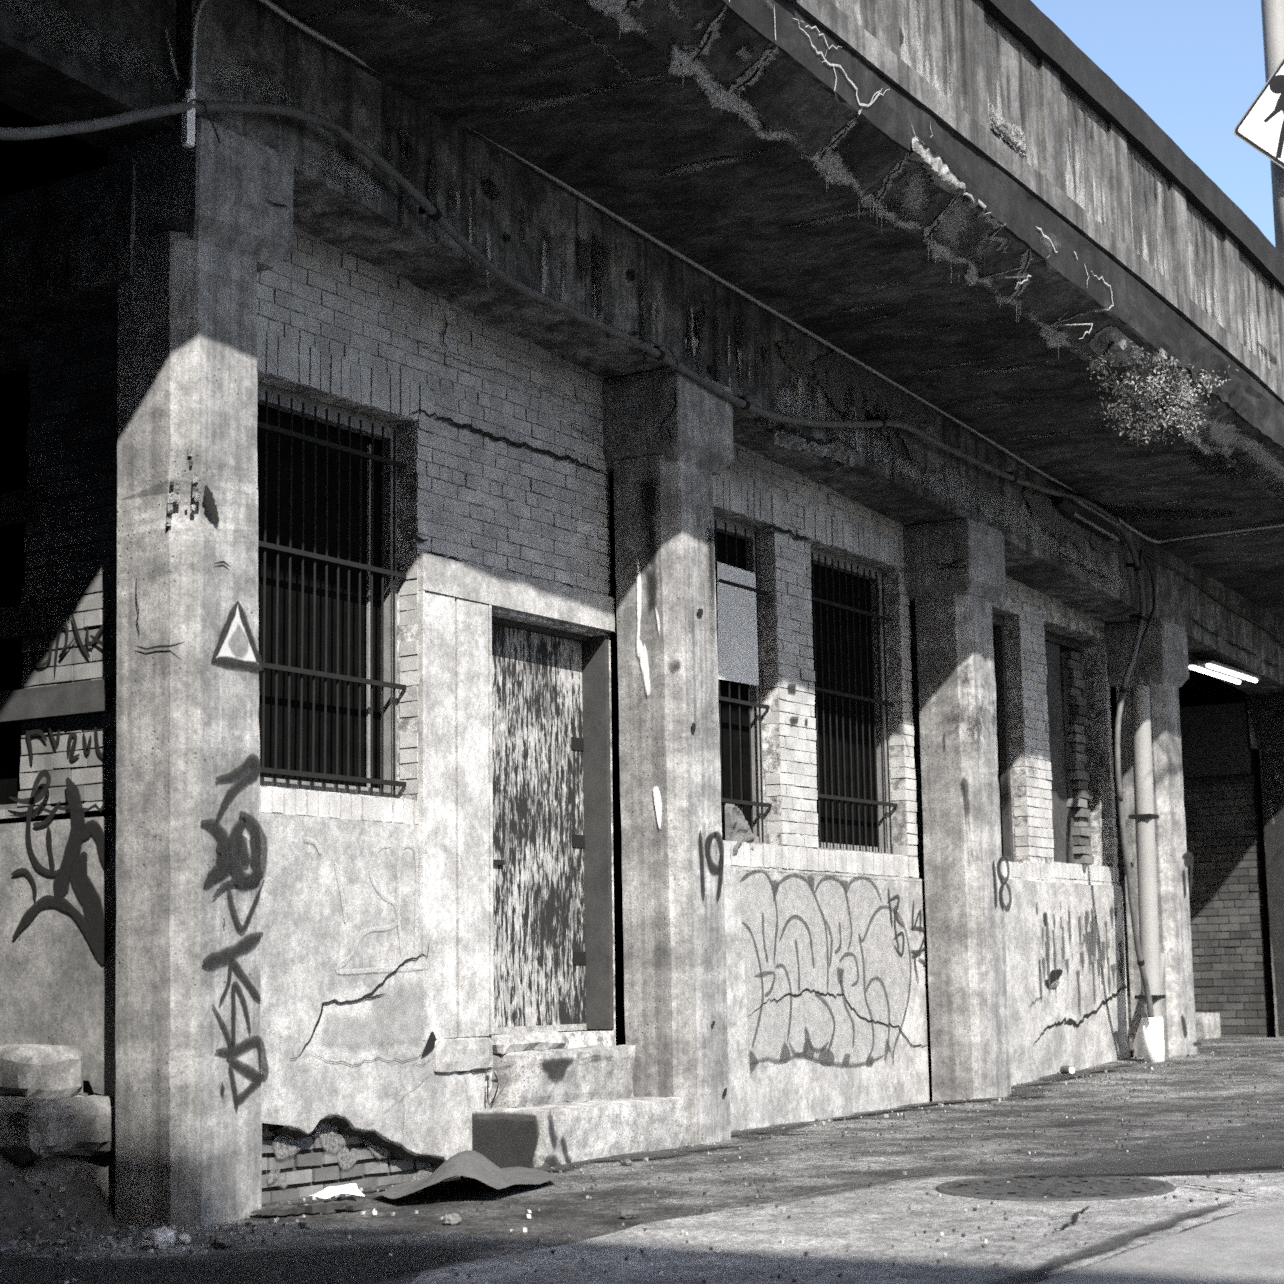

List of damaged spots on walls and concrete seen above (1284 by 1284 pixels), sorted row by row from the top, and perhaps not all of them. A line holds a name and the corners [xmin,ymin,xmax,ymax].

crack [527,0,730,88]
crack [720,8,889,192]
crack [869,125,933,223]
spalling [907,136,977,195]
spalling [988,102,1026,156]
crack [924,192,1114,339]
crack [370,312,603,472]
spalling [1118,348,1213,432]
crack [290,947,498,1111]
crack [752,988,930,1047]
crack [1030,981,1130,1044]
spalling [262,1114,445,1203]